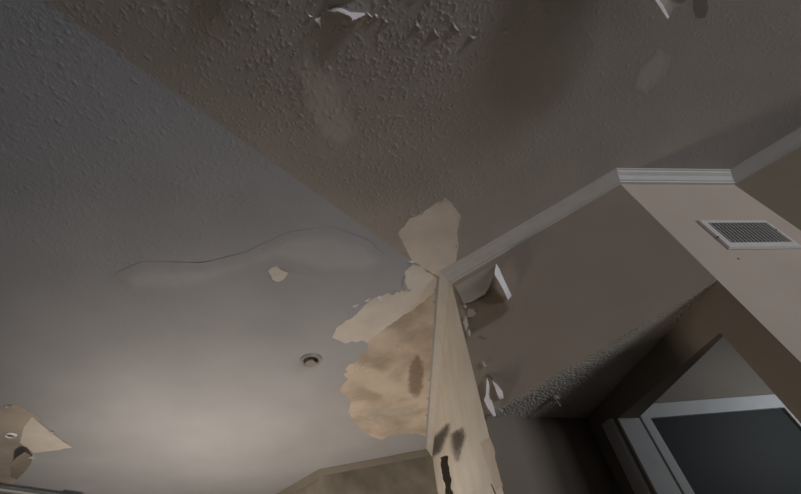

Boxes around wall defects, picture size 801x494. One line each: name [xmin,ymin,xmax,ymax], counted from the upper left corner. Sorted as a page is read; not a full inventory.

peeling [332,197,462,343]
peeling [455,264,512,336]
leakage [317,292,464,494]
peeling [0,404,72,487]
peeling [480,437,503,491]